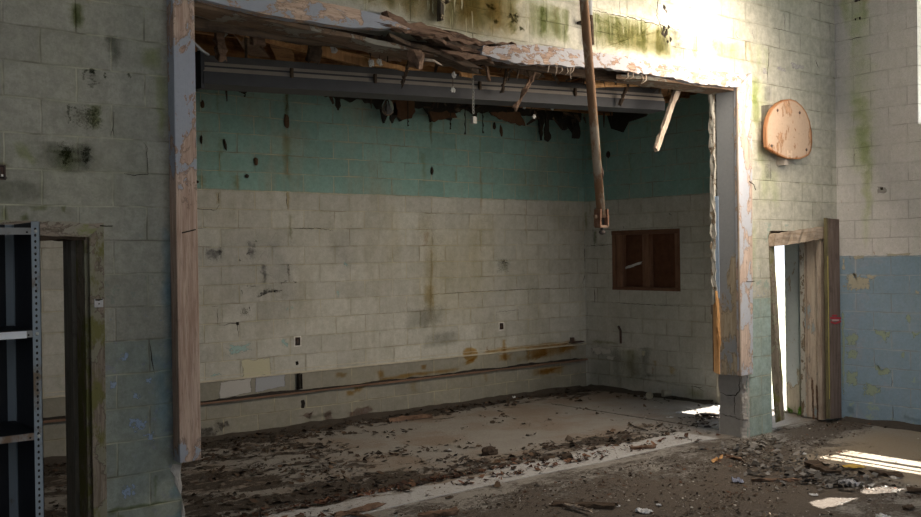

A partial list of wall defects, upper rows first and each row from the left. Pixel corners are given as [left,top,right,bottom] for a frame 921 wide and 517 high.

water stain [486,4,547,37]